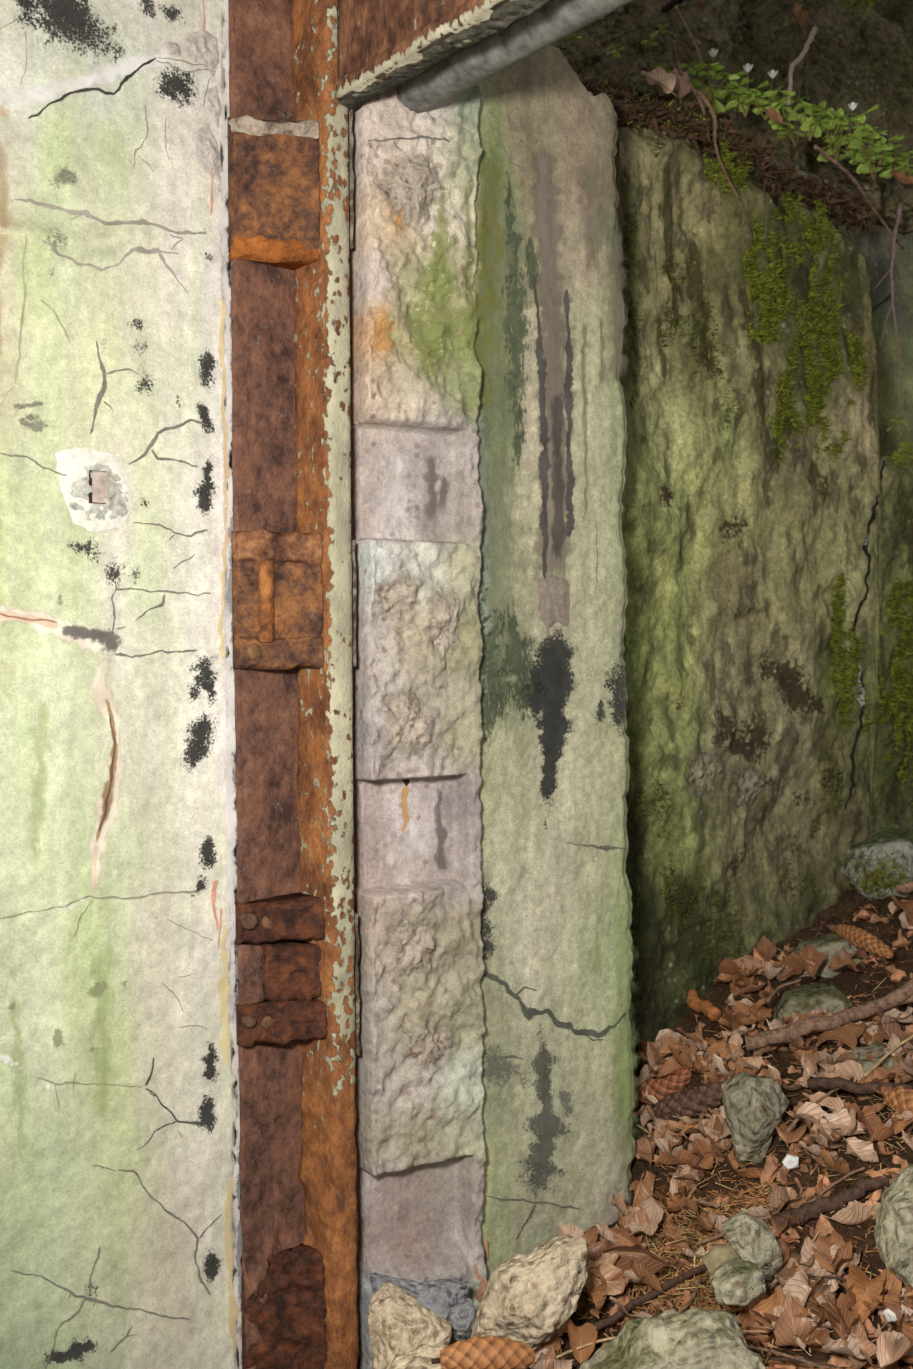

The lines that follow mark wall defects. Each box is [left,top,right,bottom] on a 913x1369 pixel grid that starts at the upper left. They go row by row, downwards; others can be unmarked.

water stain [14,0,126,63]
water stain [137,0,186,23]
water stain [464,152,636,579]
spalling [55,447,133,532]
water stain [480,473,579,829]
crack [845,460,886,810]
water stain [595,663,632,737]
rust [260,940,322,1002]
crack [483,971,626,1041]
crack [483,1055,523,1063]
water stain [516,1025,572,1199]
rust [241,1243,327,1369]